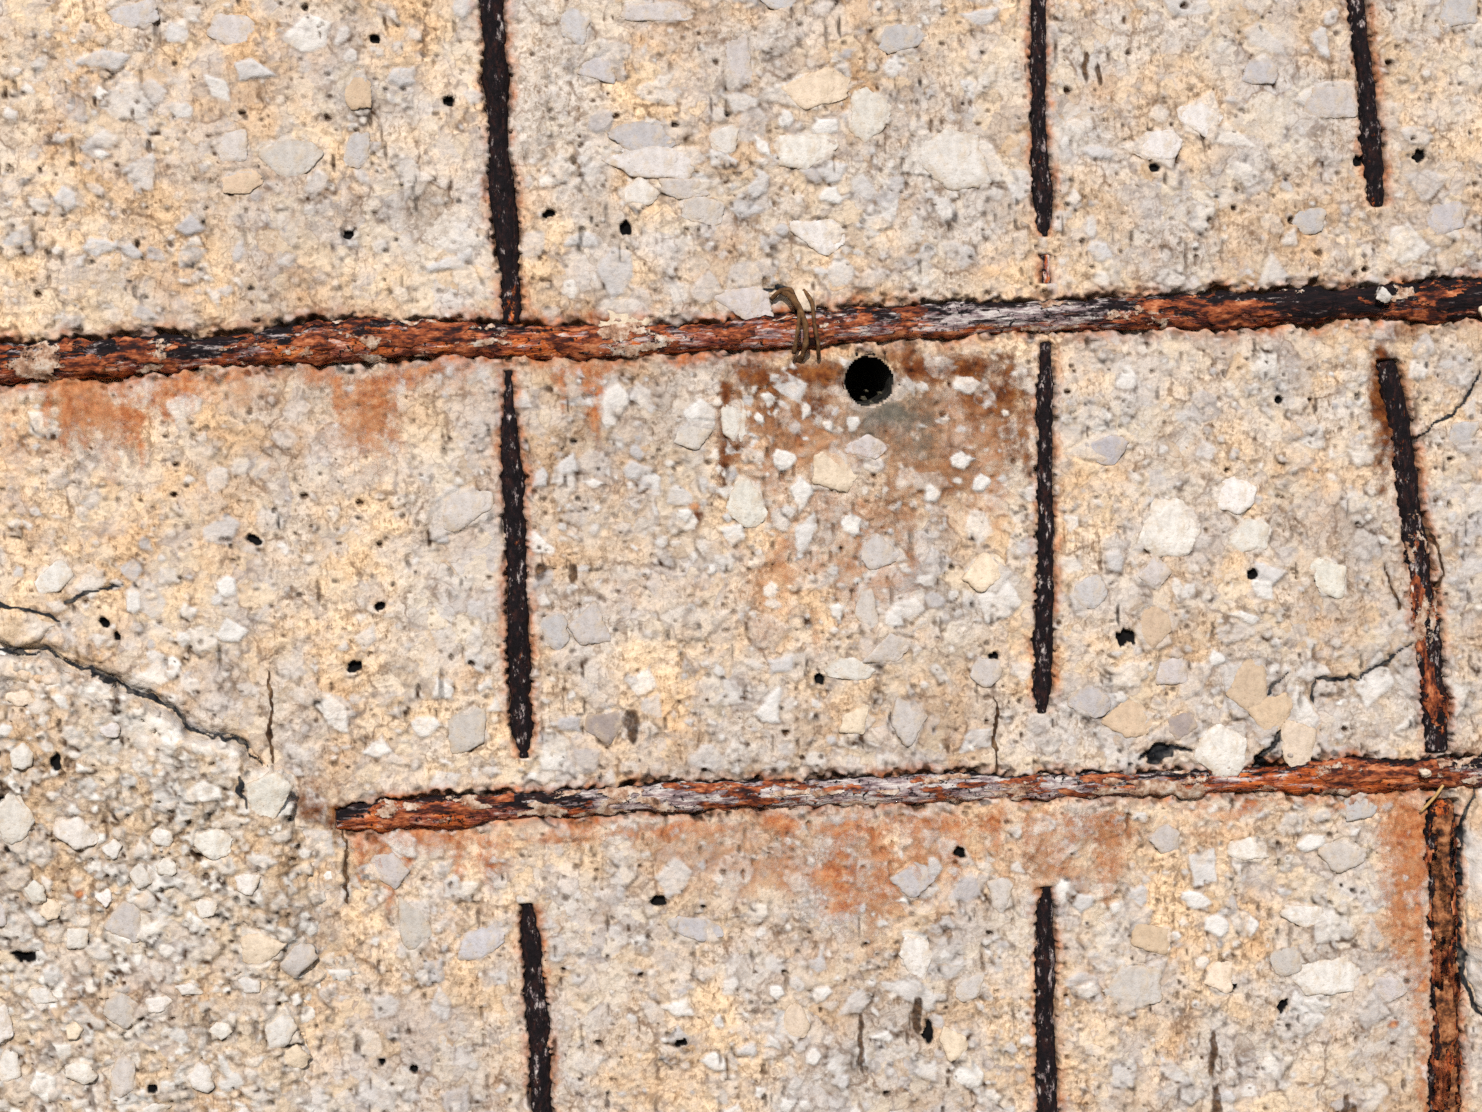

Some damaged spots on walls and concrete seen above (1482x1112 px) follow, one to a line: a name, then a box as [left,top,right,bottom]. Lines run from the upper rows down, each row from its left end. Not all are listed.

corrosion [27,369,246,449]
corrosion [718,359,844,485]
corrosion [887,346,1031,492]
corrosion [1369,346,1400,467]
spalling [0,610,360,1112]
corrosion [403,827,481,872]
corrosion [653,822,726,839]
corrosion [764,814,798,837]
corrosion [813,818,890,913]
corrosion [1368,793,1428,961]